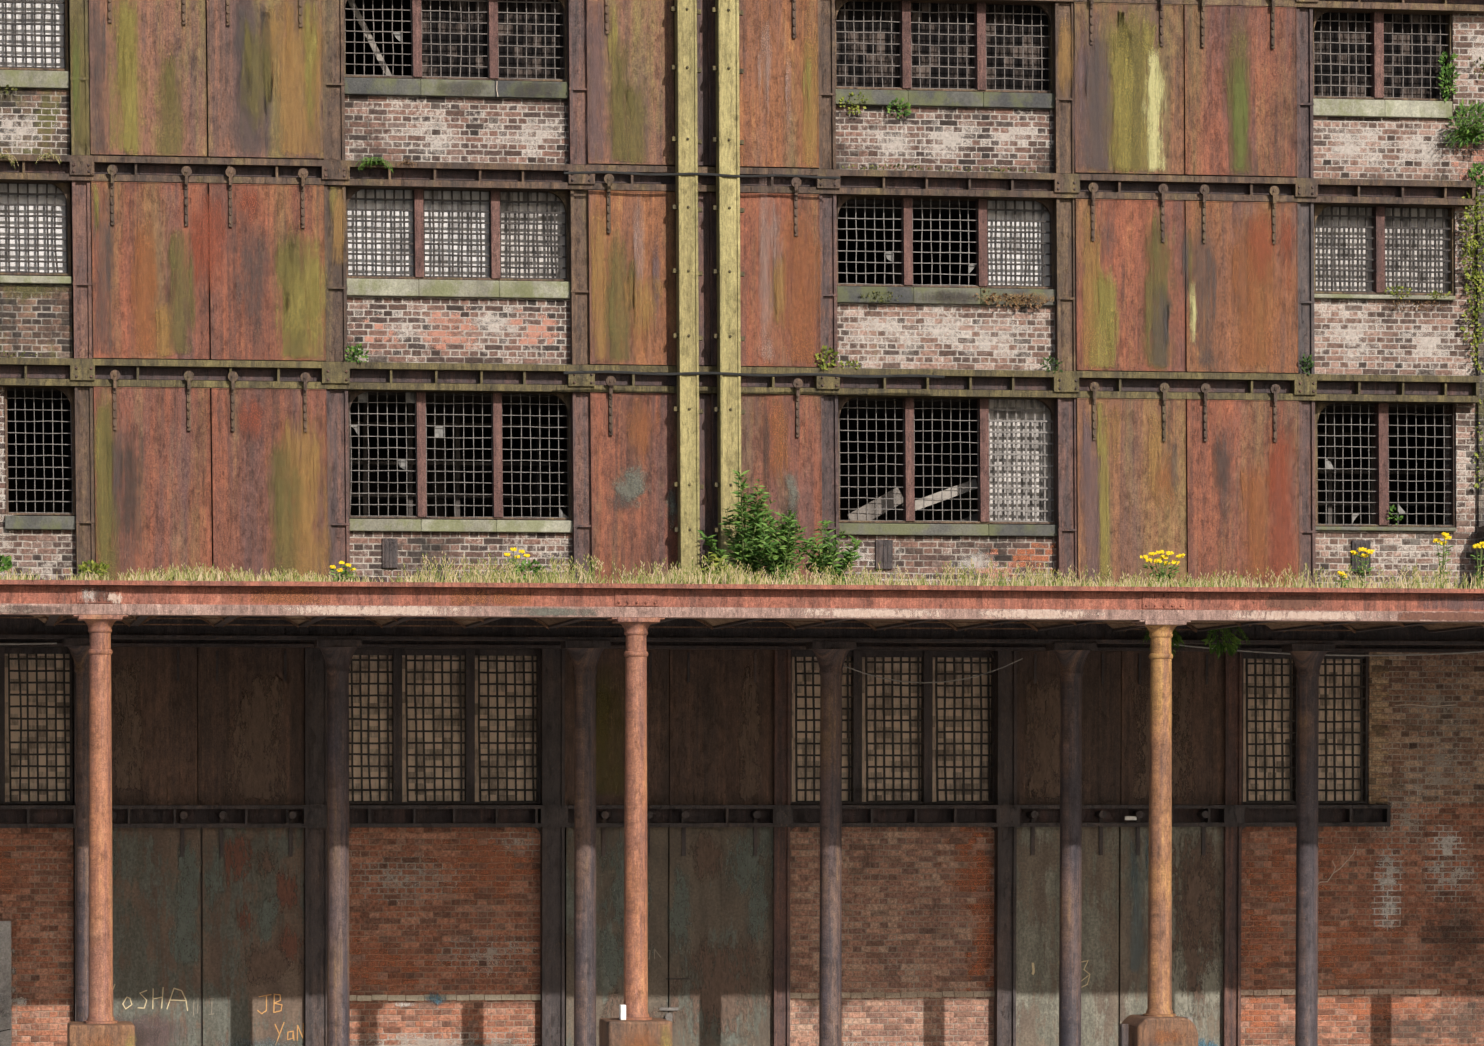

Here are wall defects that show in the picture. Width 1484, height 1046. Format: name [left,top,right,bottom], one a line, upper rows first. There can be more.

leakage [110,5,138,151]
rust [803,38,818,165]
leakage [1074,19,1164,171]
leakage [1227,32,1249,172]
rust [592,217,661,360]
rust [273,430,328,582]